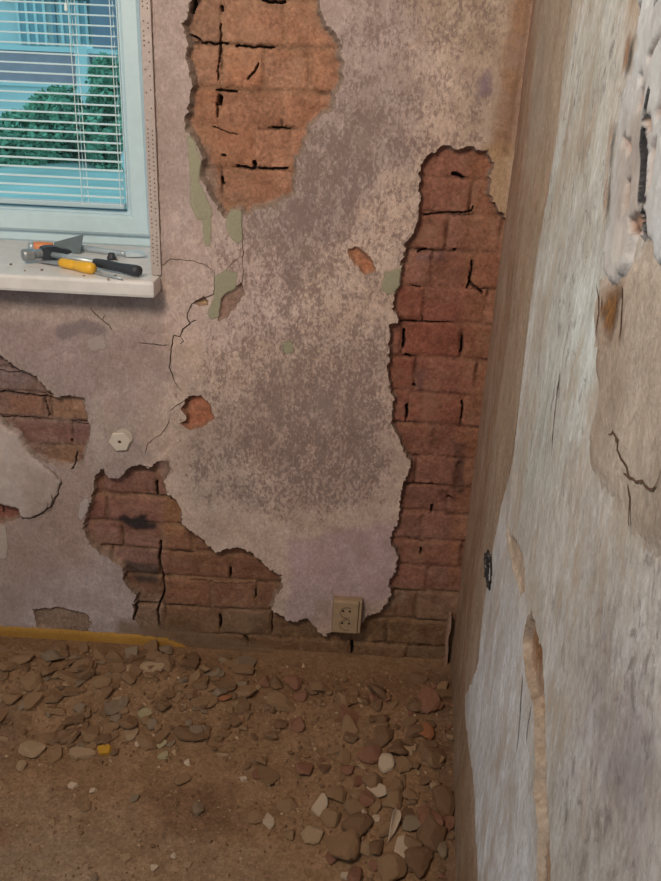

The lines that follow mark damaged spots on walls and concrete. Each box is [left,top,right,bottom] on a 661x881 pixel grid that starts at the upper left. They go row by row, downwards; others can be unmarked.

spalling [0,355,91,524]
spalling [32,606,92,632]
crack [124,12,244,474]
spalling [82,0,571,881]
flaking render [590,0,661,558]
crack [608,429,660,526]